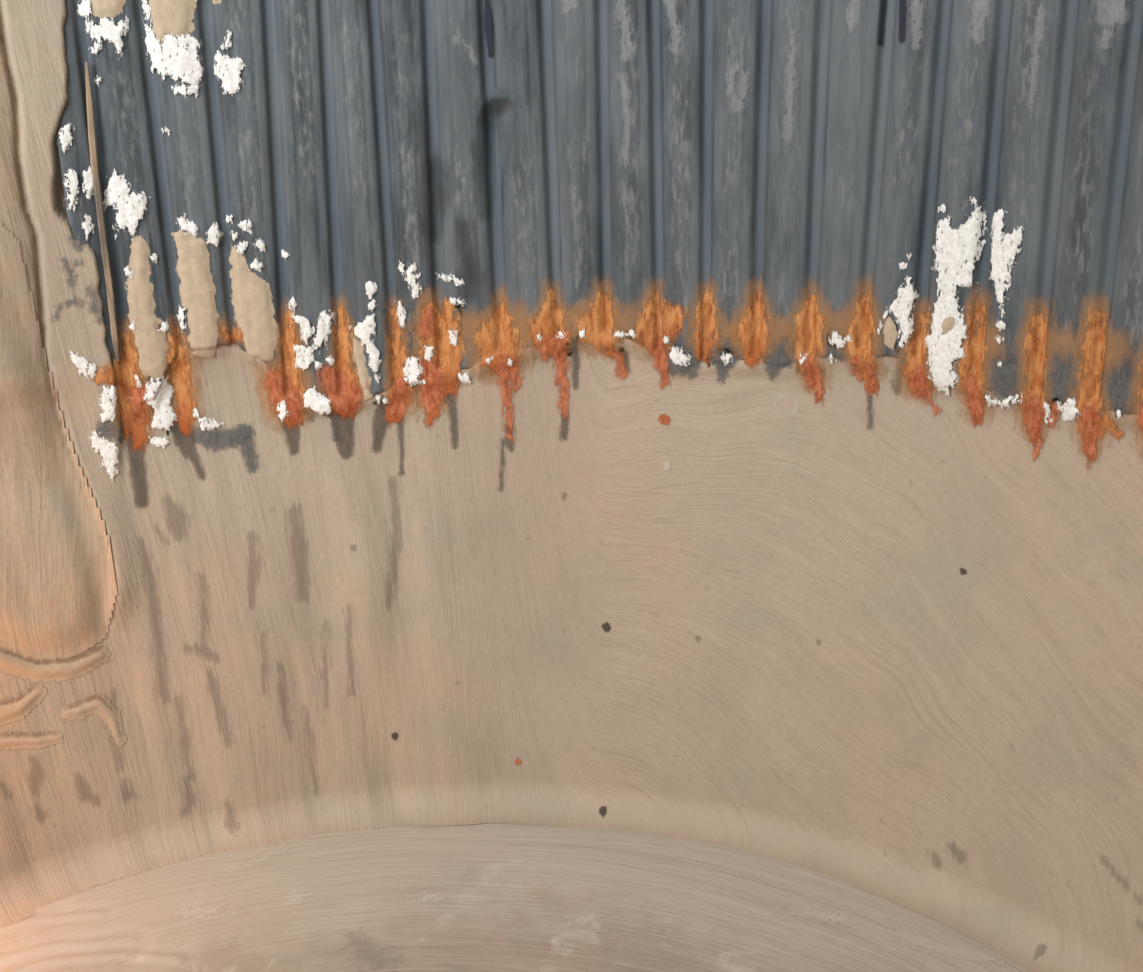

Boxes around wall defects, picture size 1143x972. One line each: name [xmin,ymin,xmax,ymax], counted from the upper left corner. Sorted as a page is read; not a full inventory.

peeling [77,0,246,98]
peeling [70,350,119,481]
peeling [61,166,151,241]
rust [92,331,153,507]
peeling [176,213,265,272]
leakage [187,424,258,472]
rust [262,309,306,454]
peeling [277,386,331,422]
rust [317,305,362,459]
rust [373,288,629,490]
rust [636,290,719,389]
peeling [877,197,1024,398]